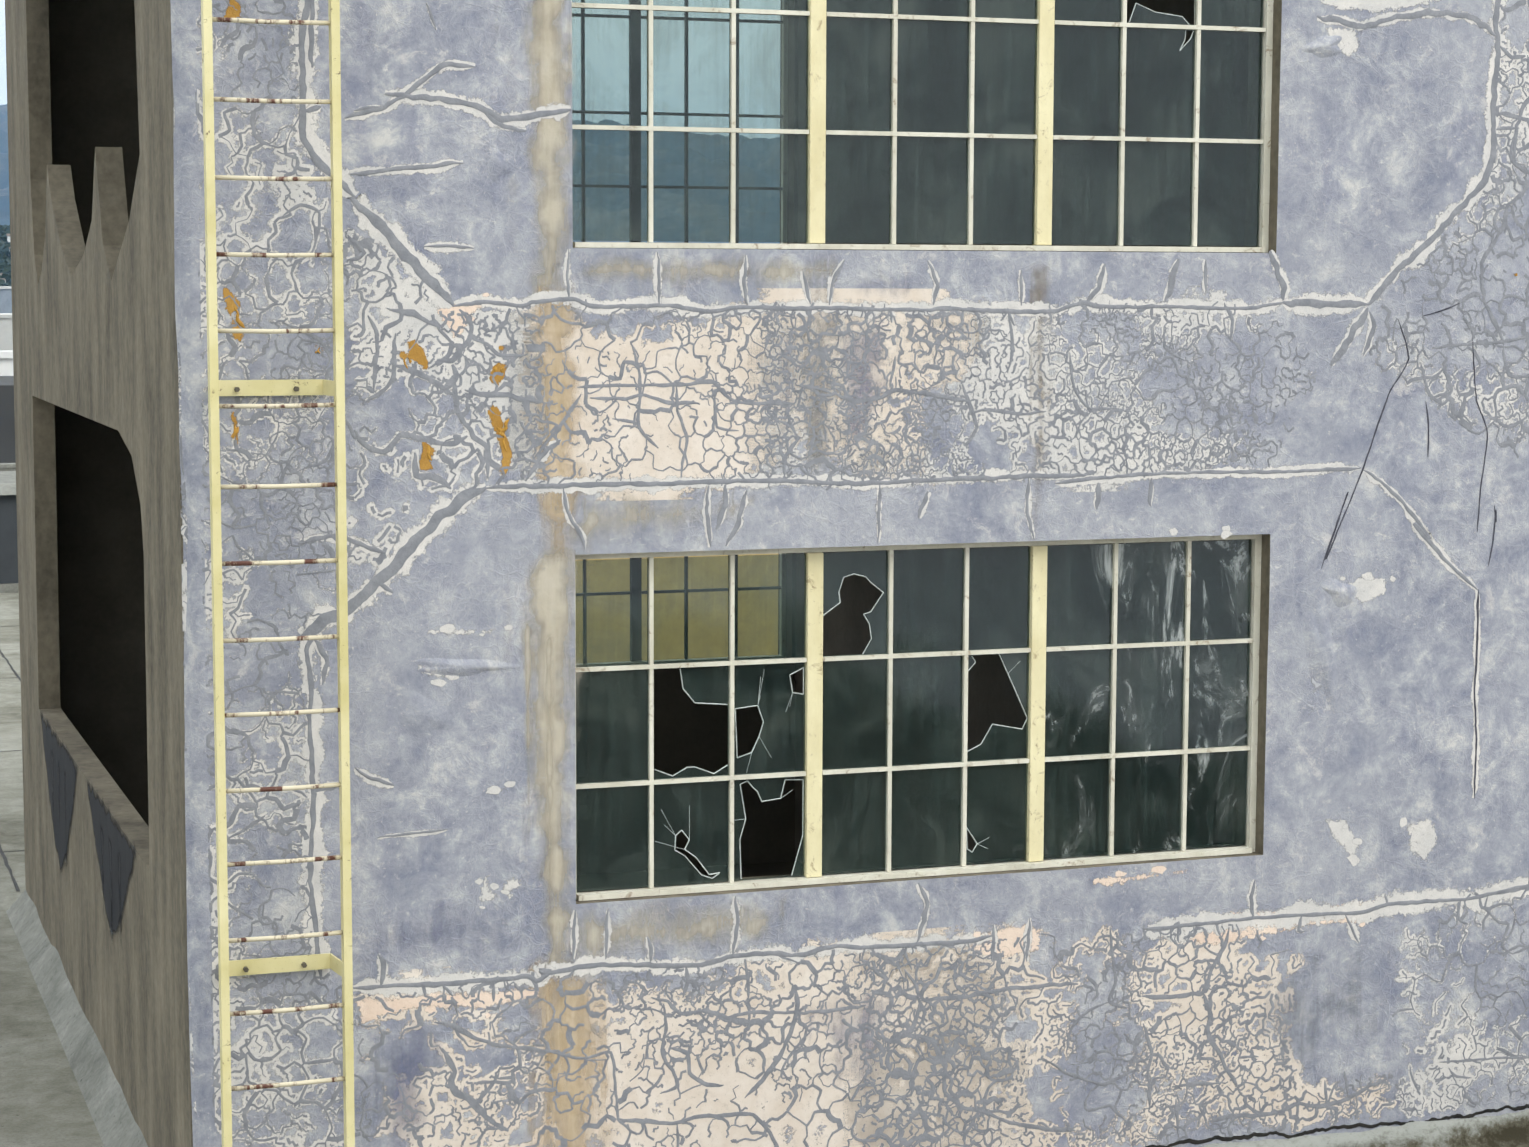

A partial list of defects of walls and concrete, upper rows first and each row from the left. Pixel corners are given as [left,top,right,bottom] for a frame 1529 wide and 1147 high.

peeling [1321,0,1440,56]
crack [342,0,1529,798]
crack [178,343,188,545]
crack [180,559,188,644]
crack [198,0,344,1147]
damp [525,0,598,1147]
peeling [1326,819,1362,867]
peeling [1400,817,1437,861]
peeling [969,924,1040,959]
crack [188,1033,196,1075]
peeling [357,989,539,1028]
crack [353,876,1529,1147]